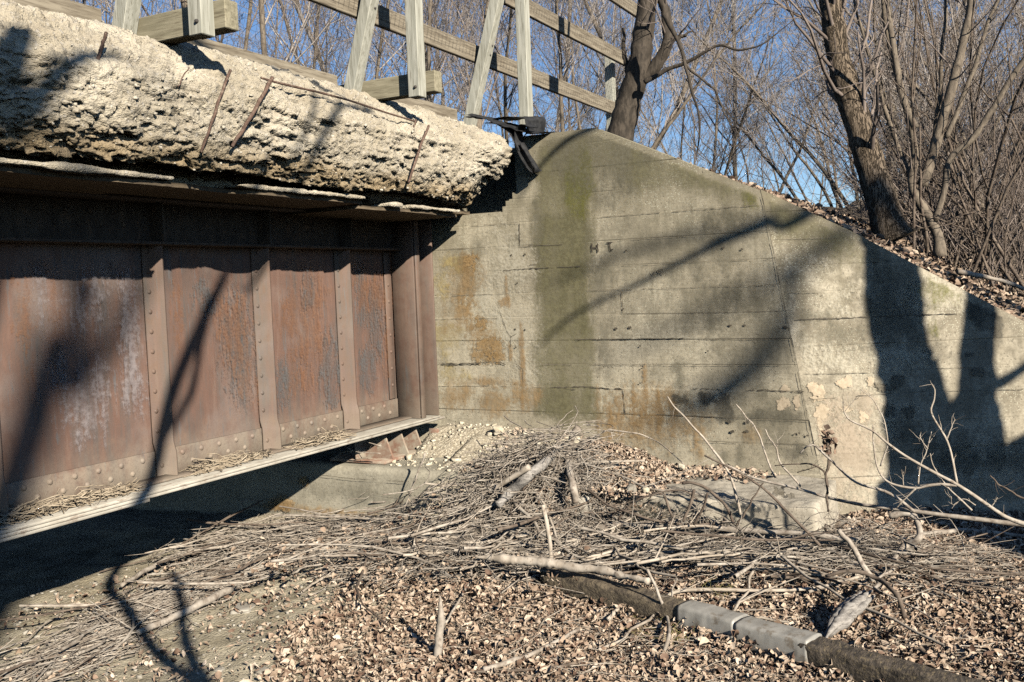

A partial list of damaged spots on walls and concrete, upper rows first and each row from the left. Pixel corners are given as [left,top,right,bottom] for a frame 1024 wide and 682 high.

spalling [0,0,512,210]
corrosion [472,315,541,413]
peeling [776,375,870,433]